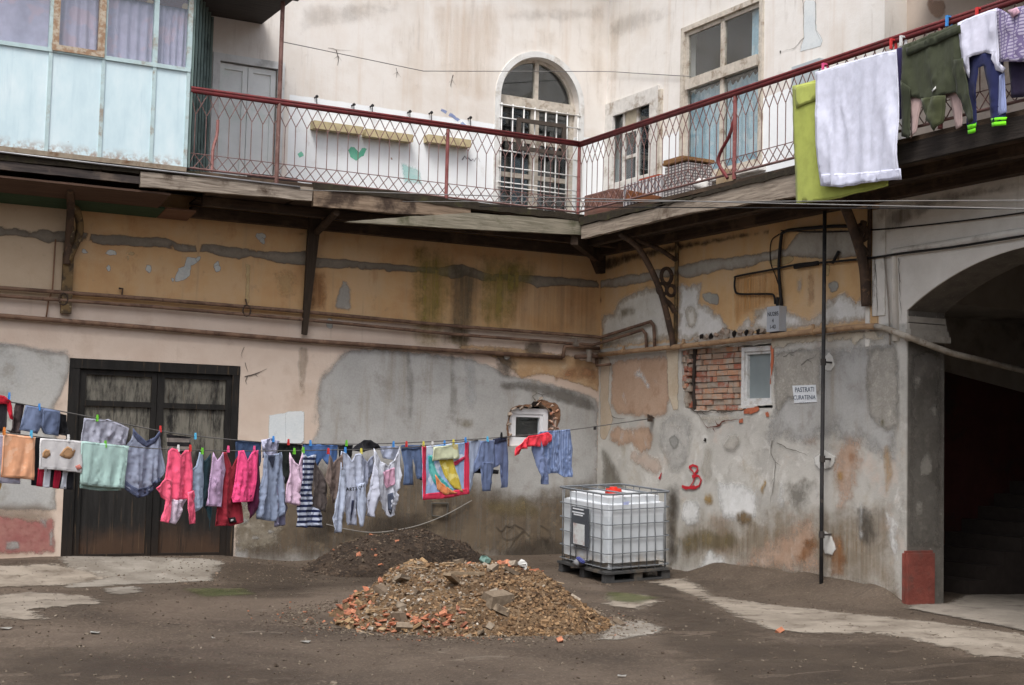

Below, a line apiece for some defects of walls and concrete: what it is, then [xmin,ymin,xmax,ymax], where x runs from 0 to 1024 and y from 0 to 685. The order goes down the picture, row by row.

peeling [171,256,201,282]
leakage [451,269,474,345]
peeling [602,264,883,384]
peeling [460,345,599,391]
spalling [506,397,561,446]
flaking render [739,406,769,423]
peeling [610,426,661,473]
crack [770,441,806,498]
peeling [0,516,55,554]
leakage [668,479,897,597]